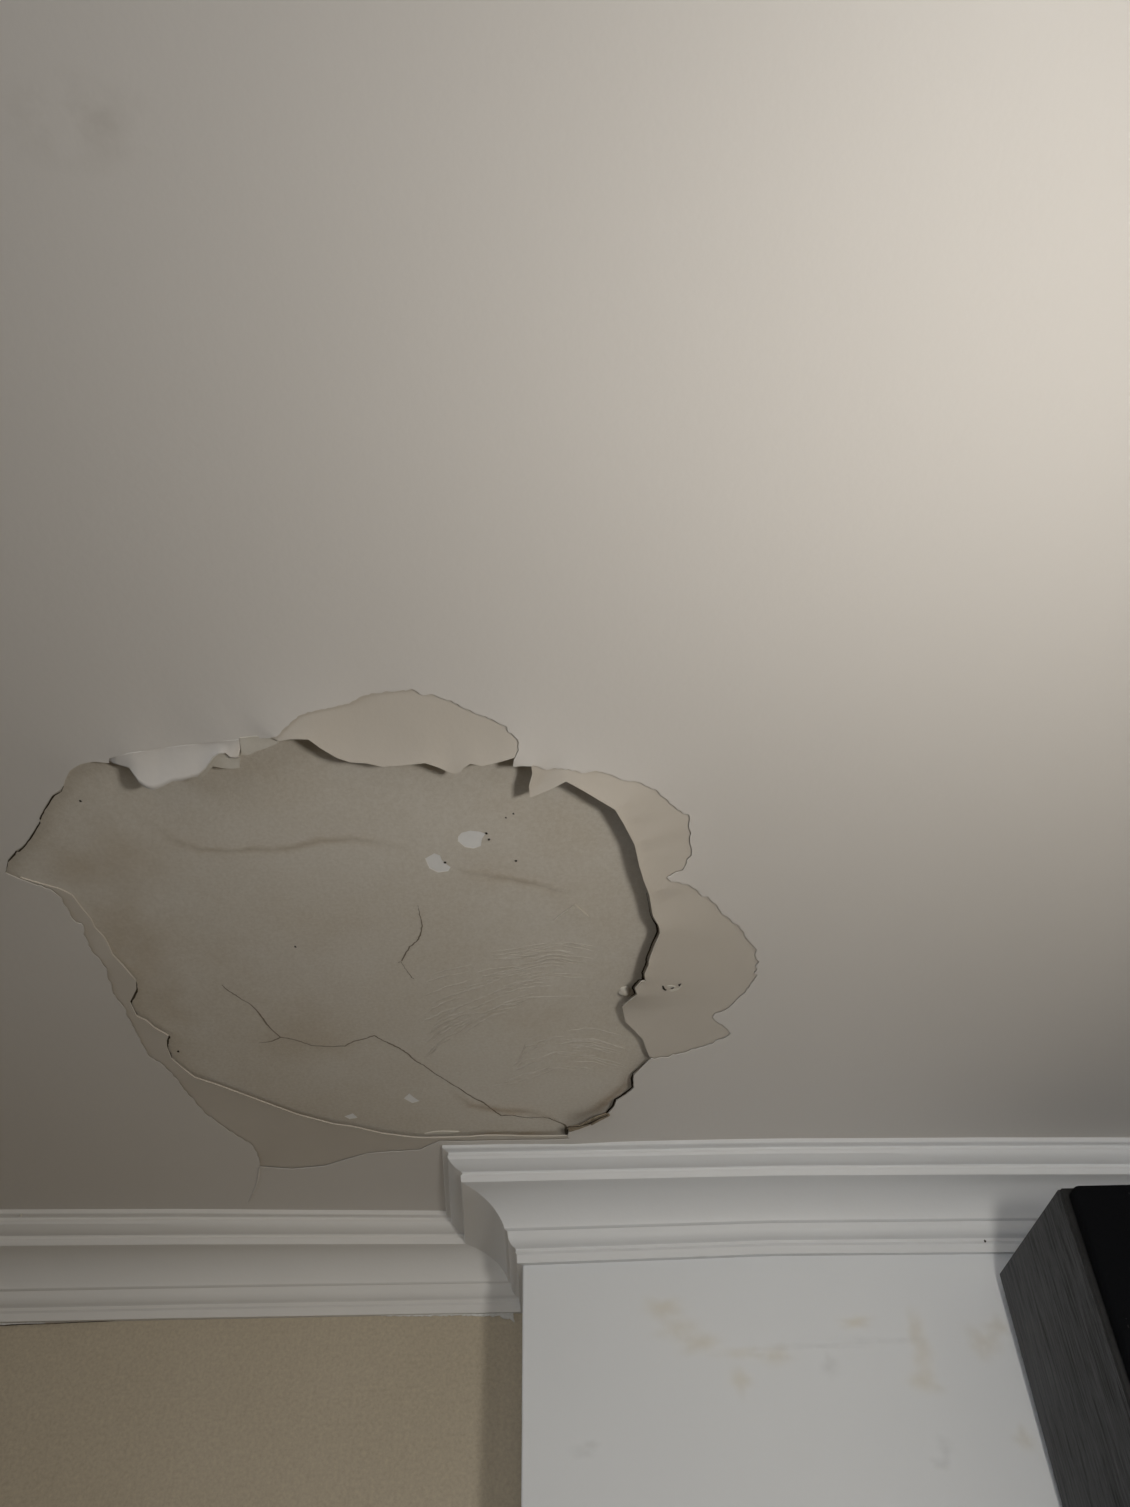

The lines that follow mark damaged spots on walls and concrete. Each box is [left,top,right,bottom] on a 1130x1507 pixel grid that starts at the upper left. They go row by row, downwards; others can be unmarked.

peeling [6,689,758,1168]